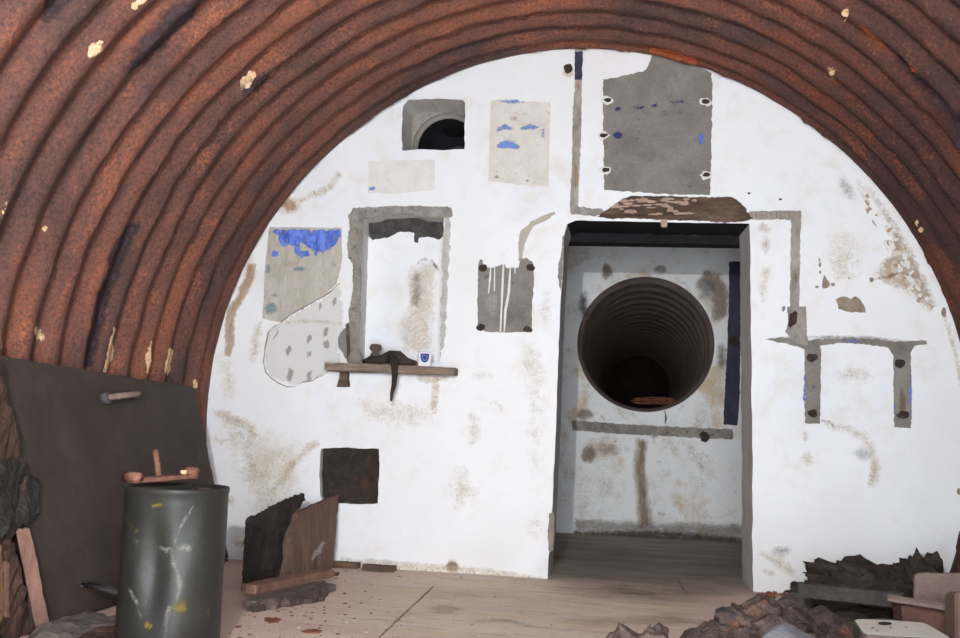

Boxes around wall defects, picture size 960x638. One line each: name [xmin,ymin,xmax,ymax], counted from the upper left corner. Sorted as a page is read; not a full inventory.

rust [42,0,71,19]
rust [124,0,202,73]
rust [241,74,269,96]
peeling [598,55,713,216]
rust [648,46,698,66]
rust [897,56,960,151]
peeling [368,160,435,194]
rust [85,223,139,366]
peeling [262,205,453,359]
peeling [476,258,535,333]
leakage [574,441,742,543]